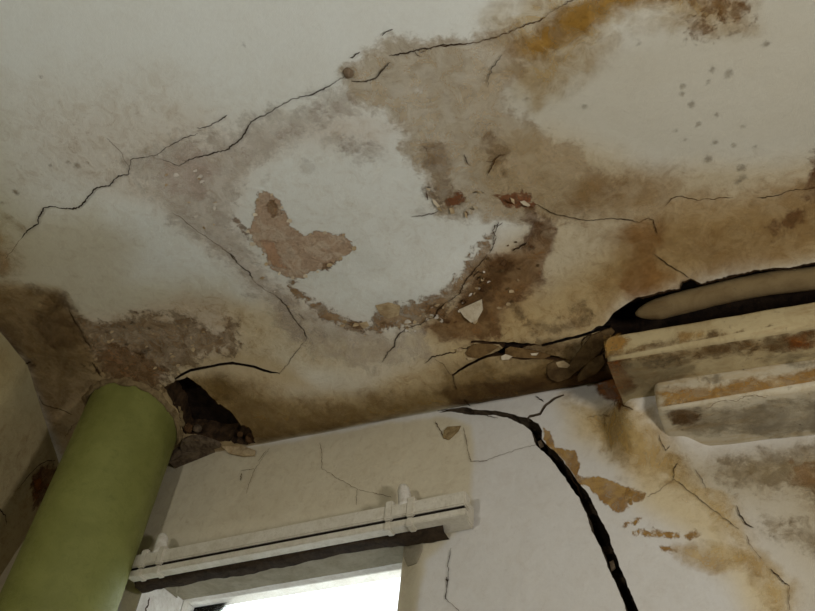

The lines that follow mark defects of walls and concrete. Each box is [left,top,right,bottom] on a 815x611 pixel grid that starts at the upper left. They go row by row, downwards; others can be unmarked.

corrosion [505,0,637,99]
corrosion [671,0,749,35]
crack [6,0,573,258]
water stain [76,310,242,393]
flaking render [164,353,256,468]
crack [175,215,307,380]
peeling [203,191,357,294]
water stain [287,39,597,341]
peeling [397,257,506,333]
water stain [202,330,815,442]
flaking render [427,321,615,390]
crack [438,394,638,611]